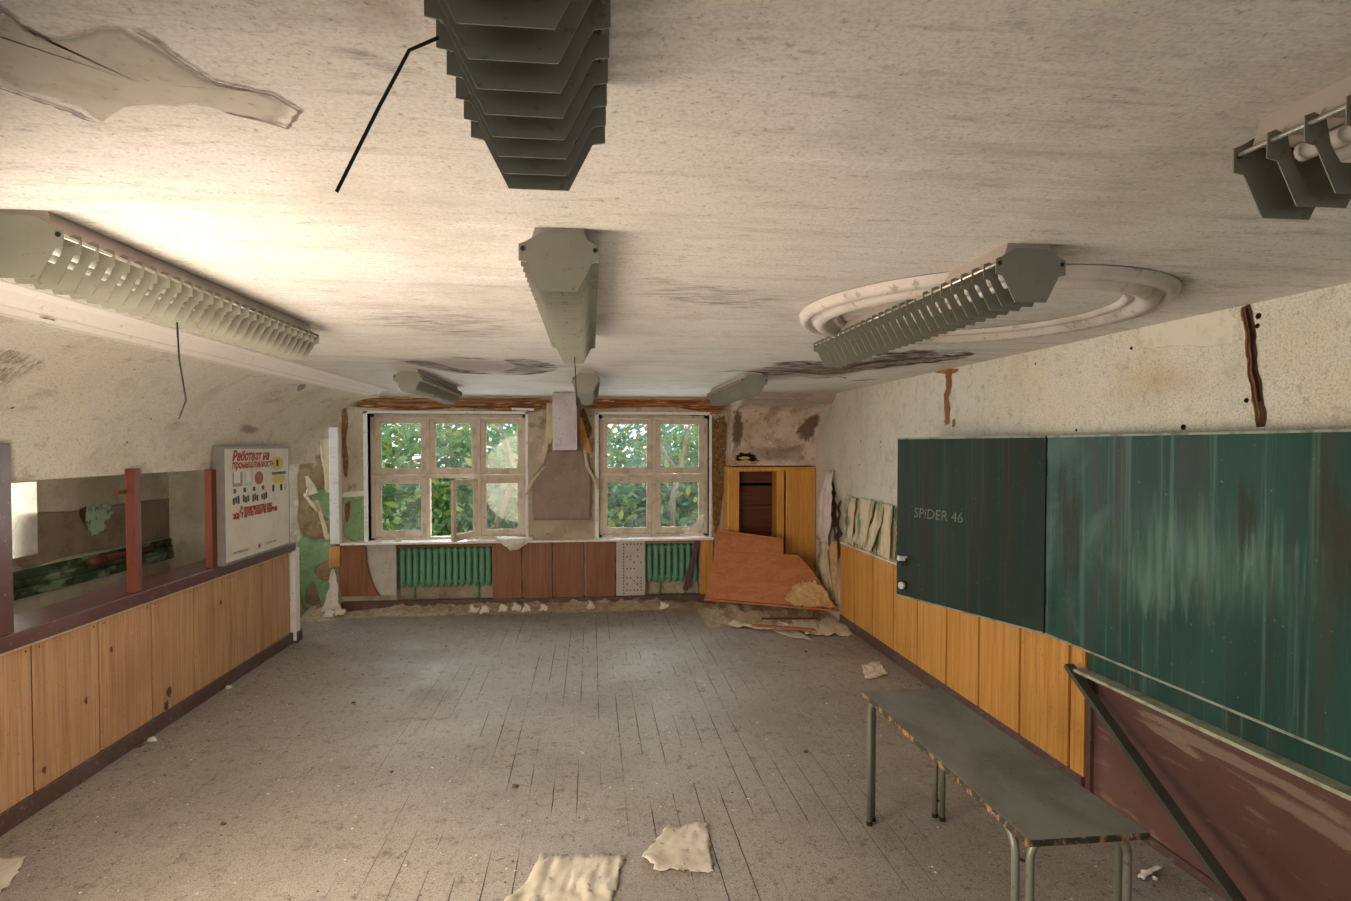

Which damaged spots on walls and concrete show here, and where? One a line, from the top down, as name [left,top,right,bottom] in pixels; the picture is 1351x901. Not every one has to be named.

flaking render [0,9,303,129]
corrosion [936,369,958,427]